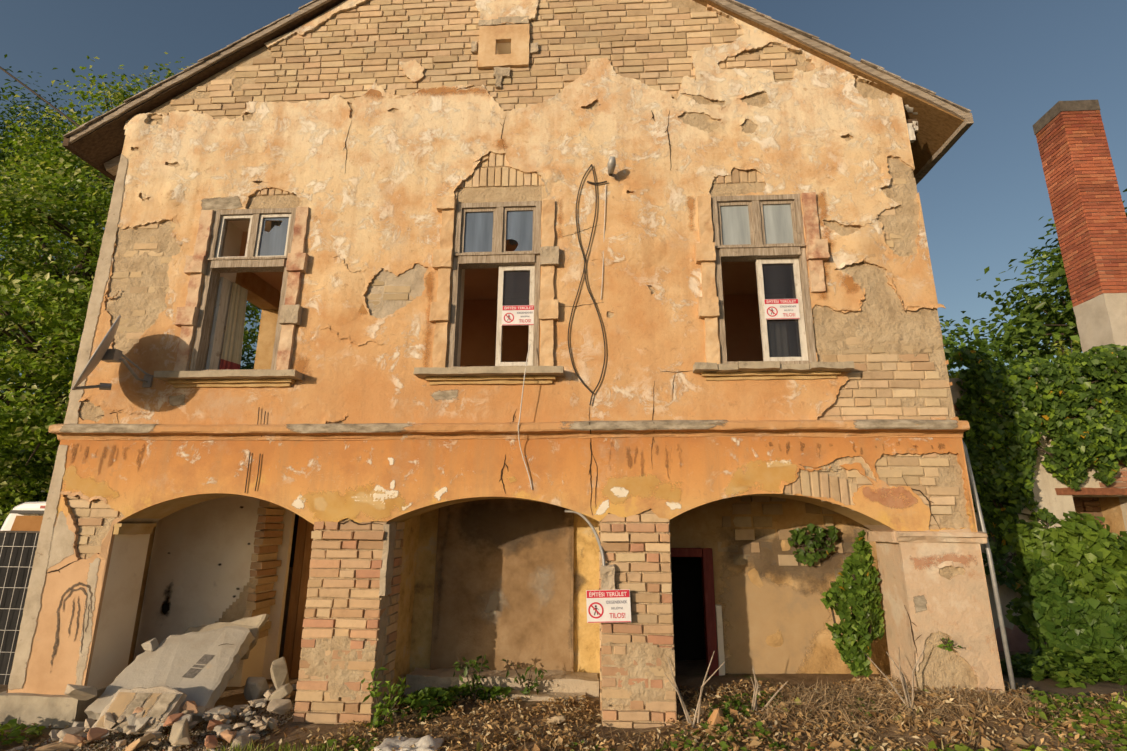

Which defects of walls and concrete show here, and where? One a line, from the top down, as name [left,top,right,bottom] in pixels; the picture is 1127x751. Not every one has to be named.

flaking render [148,0,815,134]
flaking render [452,152,547,203]
flaking render [709,166,765,194]
flaking render [823,157,920,257]
flaking render [105,218,183,358]
flaking render [329,253,428,319]
flaking render [813,258,955,420]
flaking render [60,466,124,560]
flaking render [717,452,971,586]